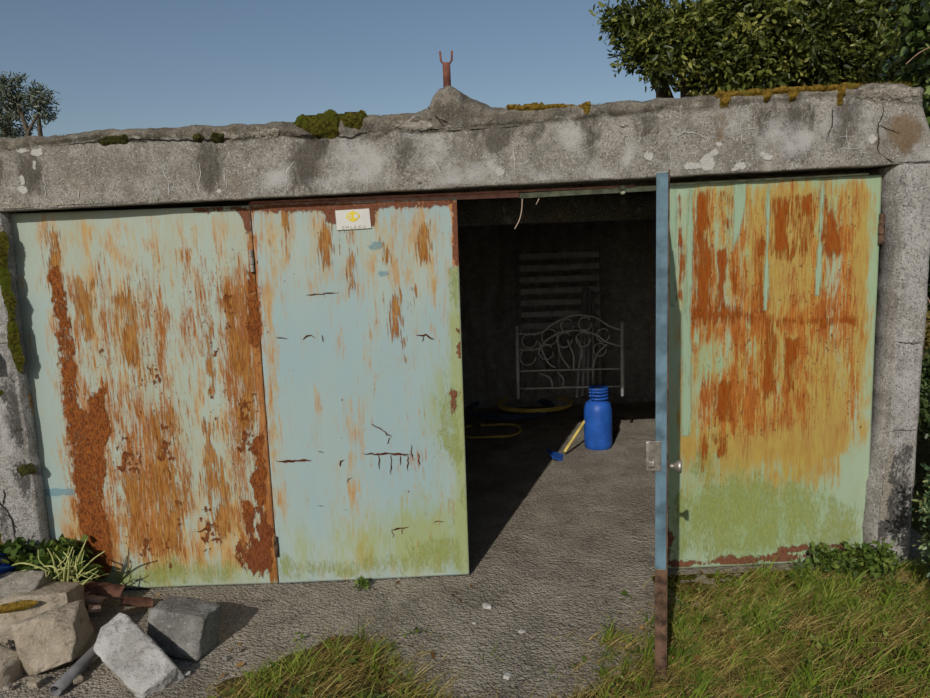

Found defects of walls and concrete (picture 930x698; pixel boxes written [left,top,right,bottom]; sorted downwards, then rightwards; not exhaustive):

water stain [19,155,41,193]
water stain [197,145,222,191]
water stain [265,132,448,190]
water stain [442,120,513,183]
water stain [558,118,608,178]
peeling [684,142,723,171]
rust [193,199,458,291]
rust [383,287,406,362]
water stain [0,352,30,497]
rust [44,224,276,581]
rust [449,390,461,413]
rust [665,169,861,677]